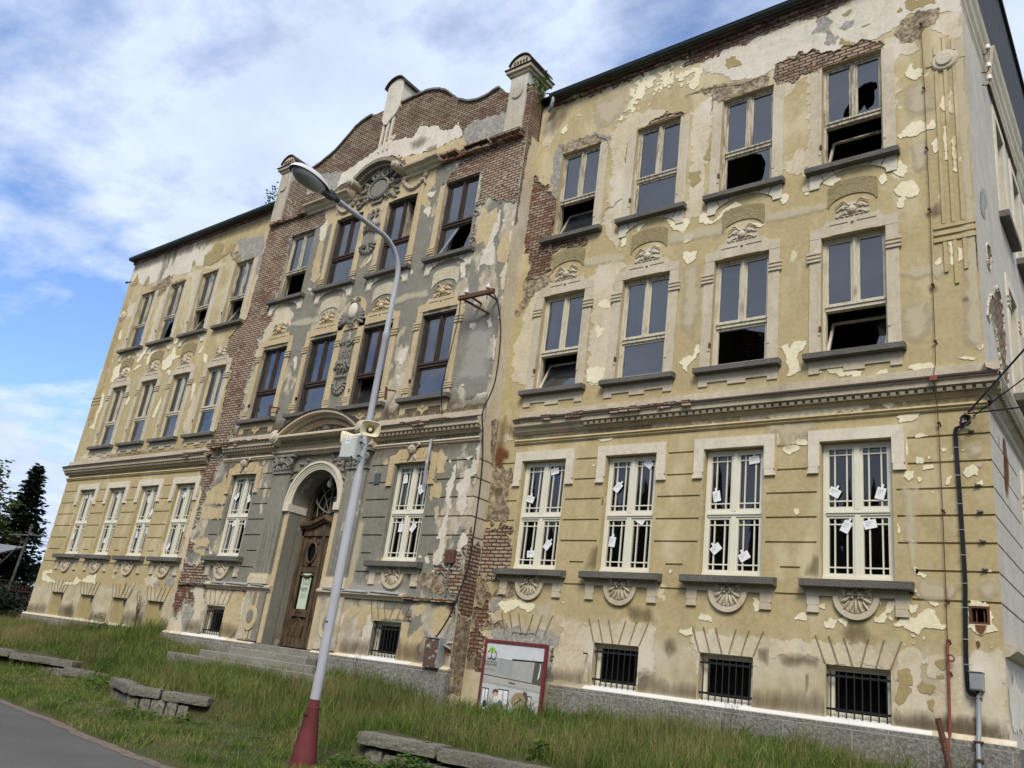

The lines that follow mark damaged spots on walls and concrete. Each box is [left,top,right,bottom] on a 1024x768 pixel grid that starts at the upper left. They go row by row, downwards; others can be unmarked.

peeling [111,239,241,383]
peeling [167,0,964,641]
flaking render [987,285,1010,387]
flaking render [337,419,670,696]
flaking render [679,566,1024,740]
leakage [943,724,985,735]